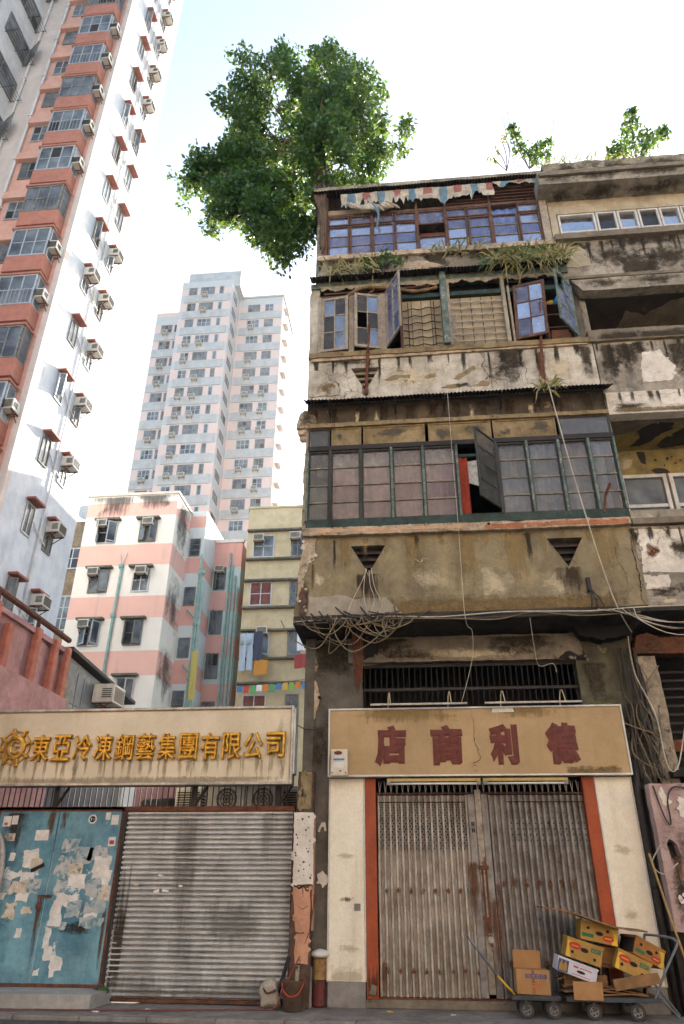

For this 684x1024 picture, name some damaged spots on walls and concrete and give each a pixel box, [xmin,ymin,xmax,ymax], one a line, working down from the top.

water stain [547,158,683,201]
water stain [569,234,684,286]
water stain [494,350,525,382]
water stain [578,327,684,377]
water stain [177,505,187,546]
flaking render [296,523,467,616]
water stain [391,566,627,613]
peeling [483,517,684,590]
peeling [657,787,684,818]
corrosion [385,861,479,915]
corrosion [493,879,576,976]
corrosion [368,963,480,997]